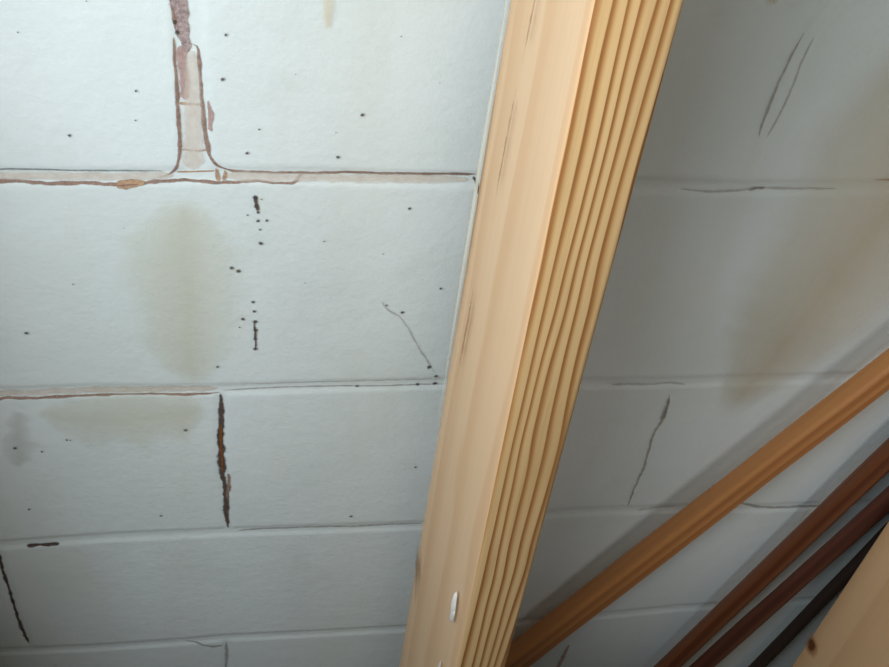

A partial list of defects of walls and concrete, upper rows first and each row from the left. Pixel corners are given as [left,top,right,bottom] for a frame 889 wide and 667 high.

crack [0,0,479,245]
crack [239,301,257,350]
crack [0,387,231,527]
crack [628,397,670,505]
crack [0,555,29,643]